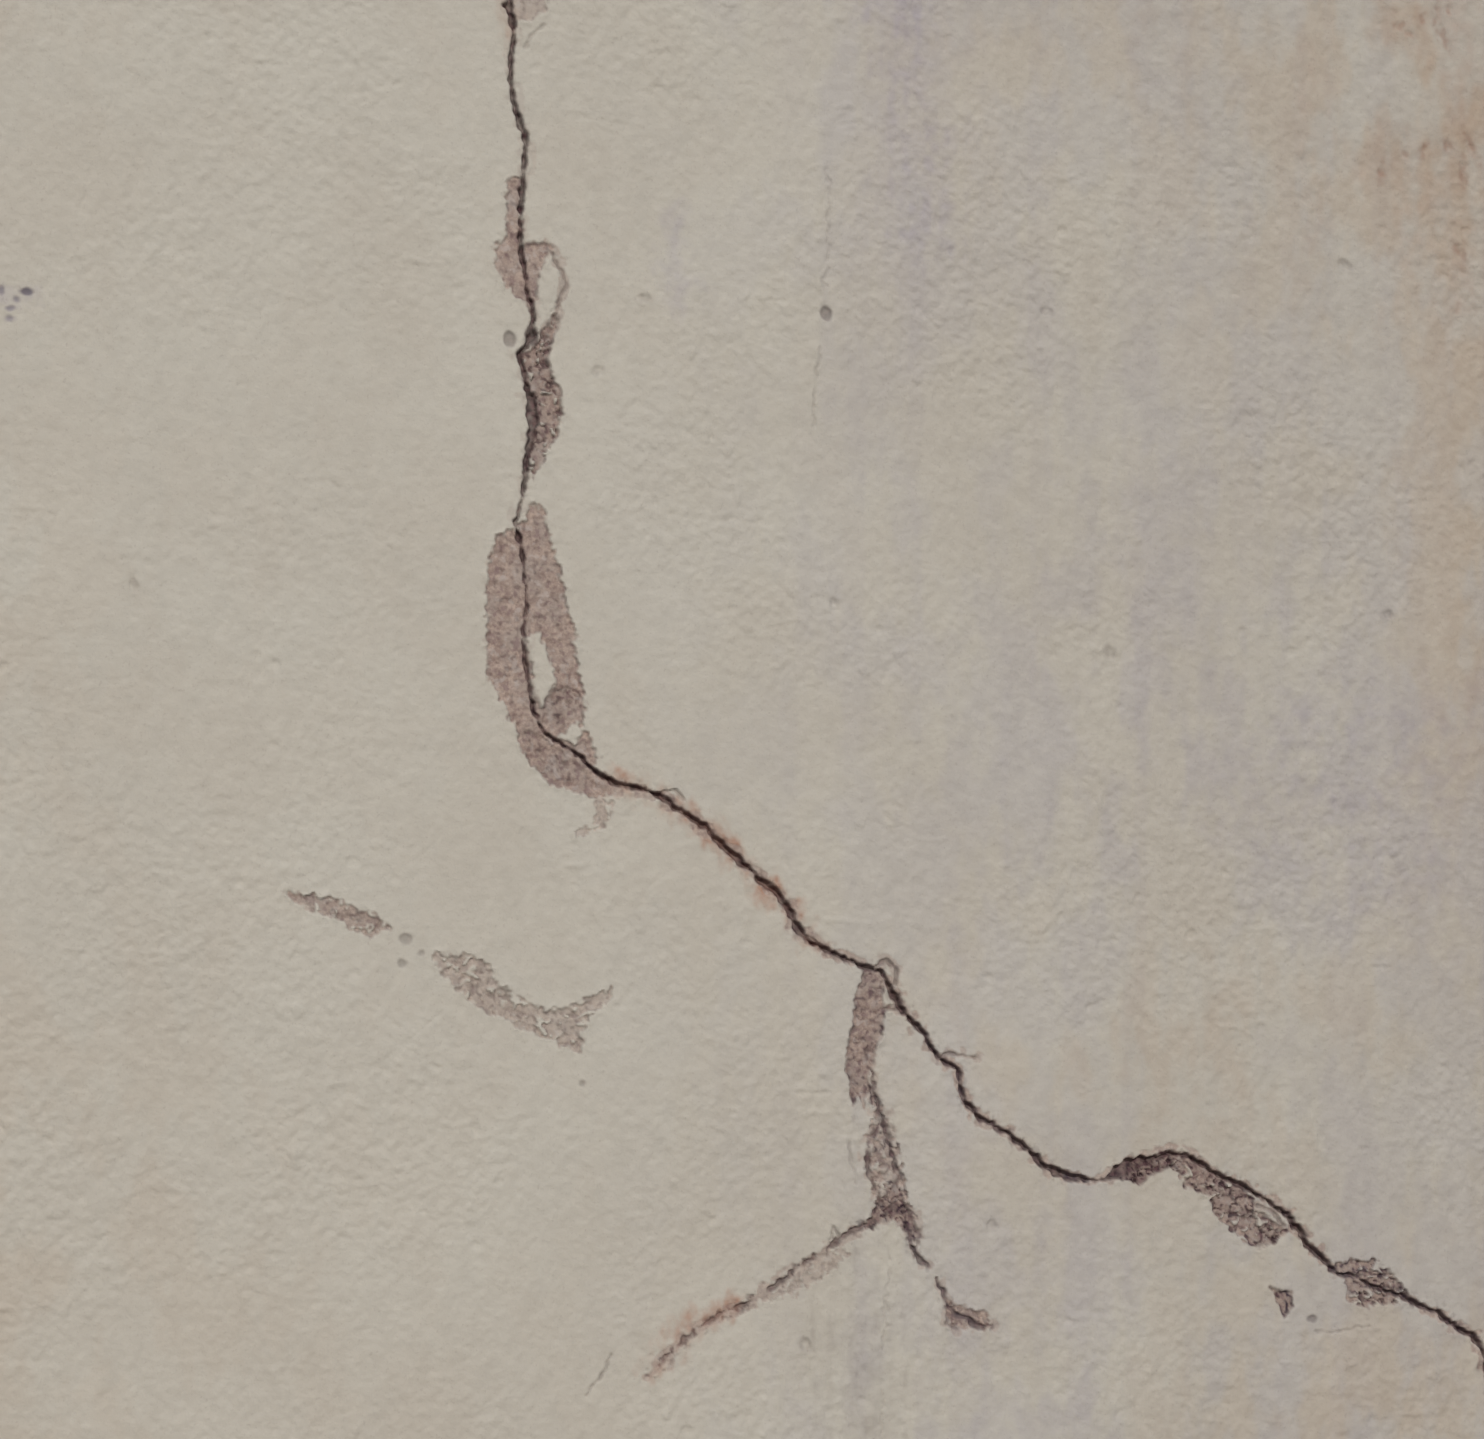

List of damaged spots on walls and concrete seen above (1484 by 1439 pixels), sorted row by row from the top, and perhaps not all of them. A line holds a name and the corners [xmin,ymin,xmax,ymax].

peeling [489,175,571,482]
spalling [481,501,616,840]
crack [498,0,1484,1383]
spalling [283,889,614,1056]
spalling [1119,1160,1289,1252]
spalling [1267,1256,1410,1336]